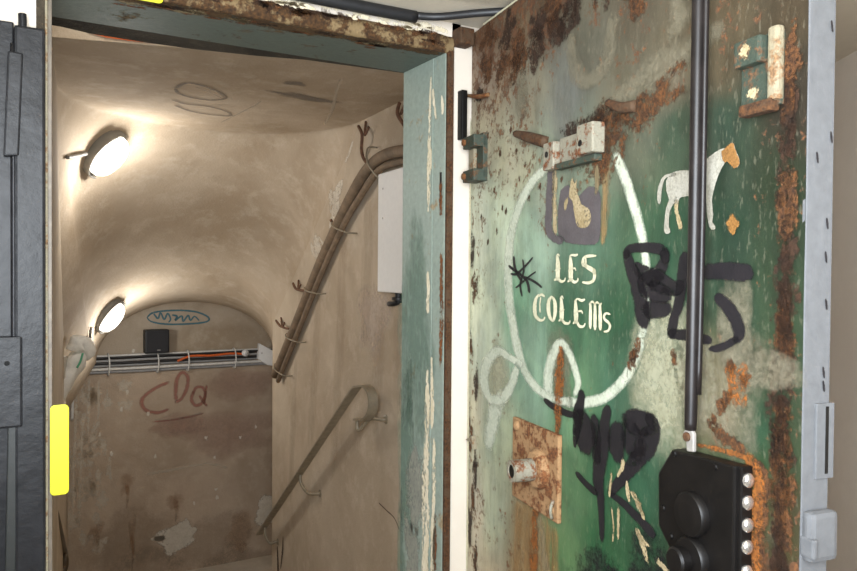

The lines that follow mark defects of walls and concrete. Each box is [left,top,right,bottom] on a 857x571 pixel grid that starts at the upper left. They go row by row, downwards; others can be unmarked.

rust [116,0,442,55]
rust [476,0,581,102]
rust [562,60,686,185]
rust [698,18,803,571]
rust [554,346,564,434]
rust [627,337,641,370]
flaking render [151,518,197,556]